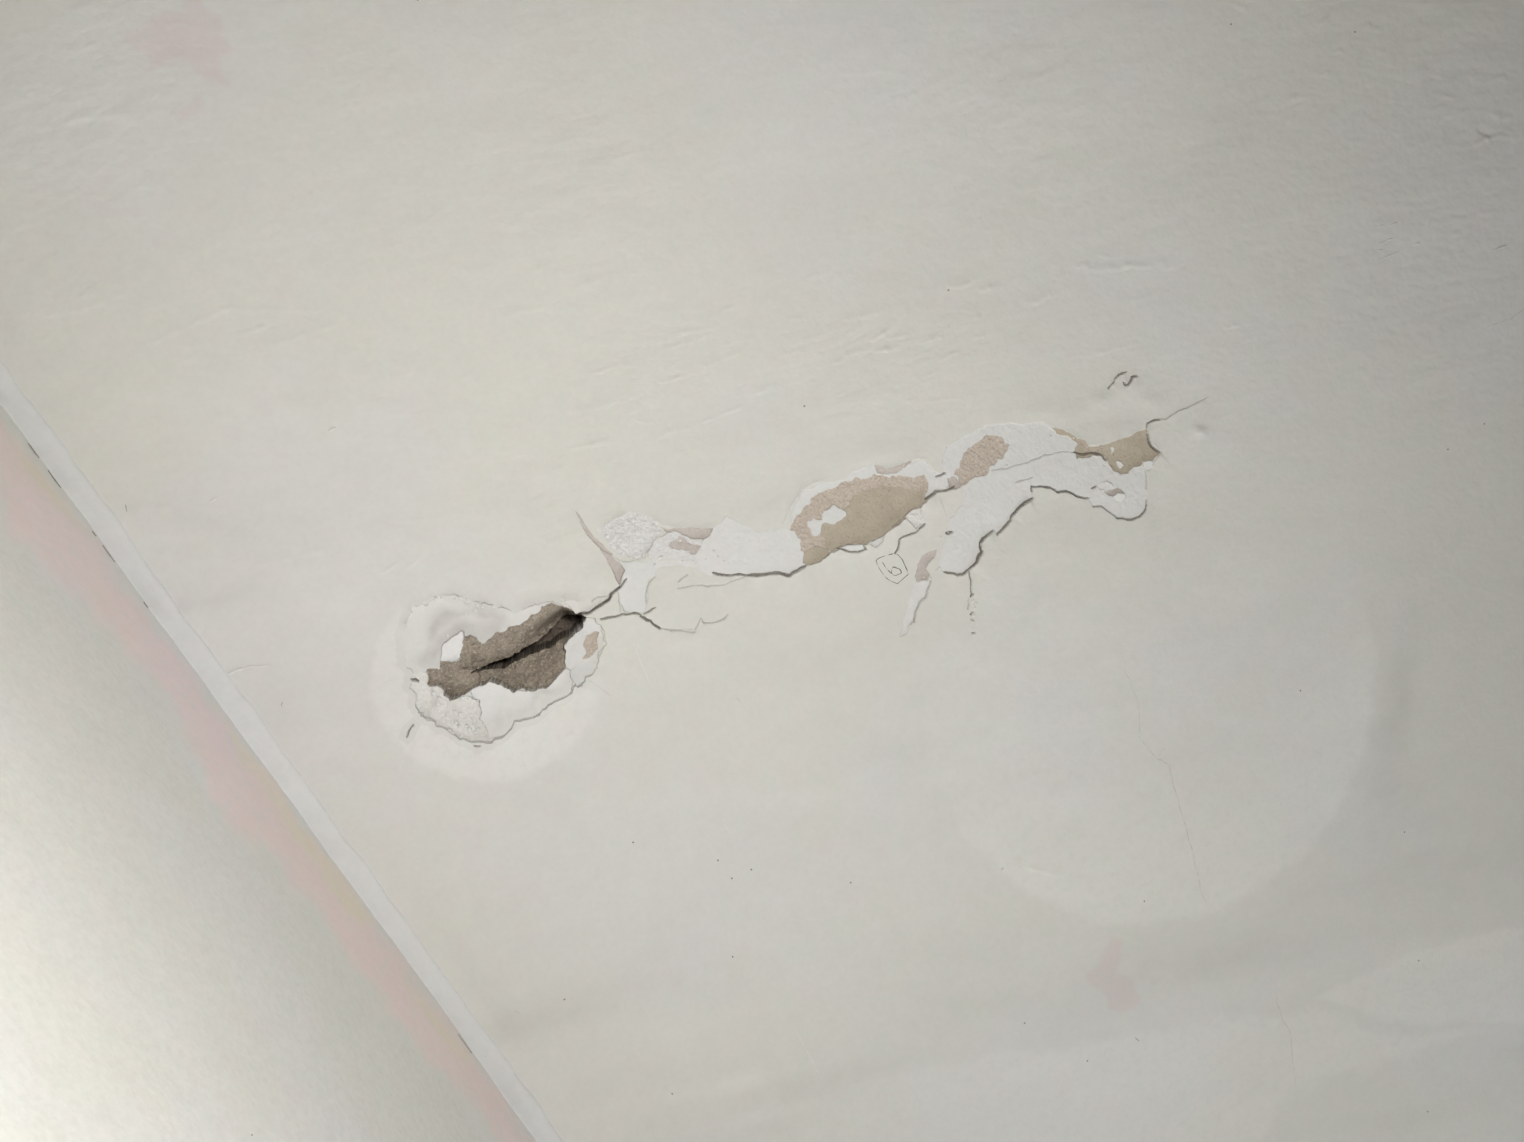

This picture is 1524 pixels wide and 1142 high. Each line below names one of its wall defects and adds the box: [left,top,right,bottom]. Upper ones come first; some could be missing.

peeling [410,603,601,744]
crack [564,511,727,633]
peeling [601,396,1209,637]
crack [967,570,977,637]